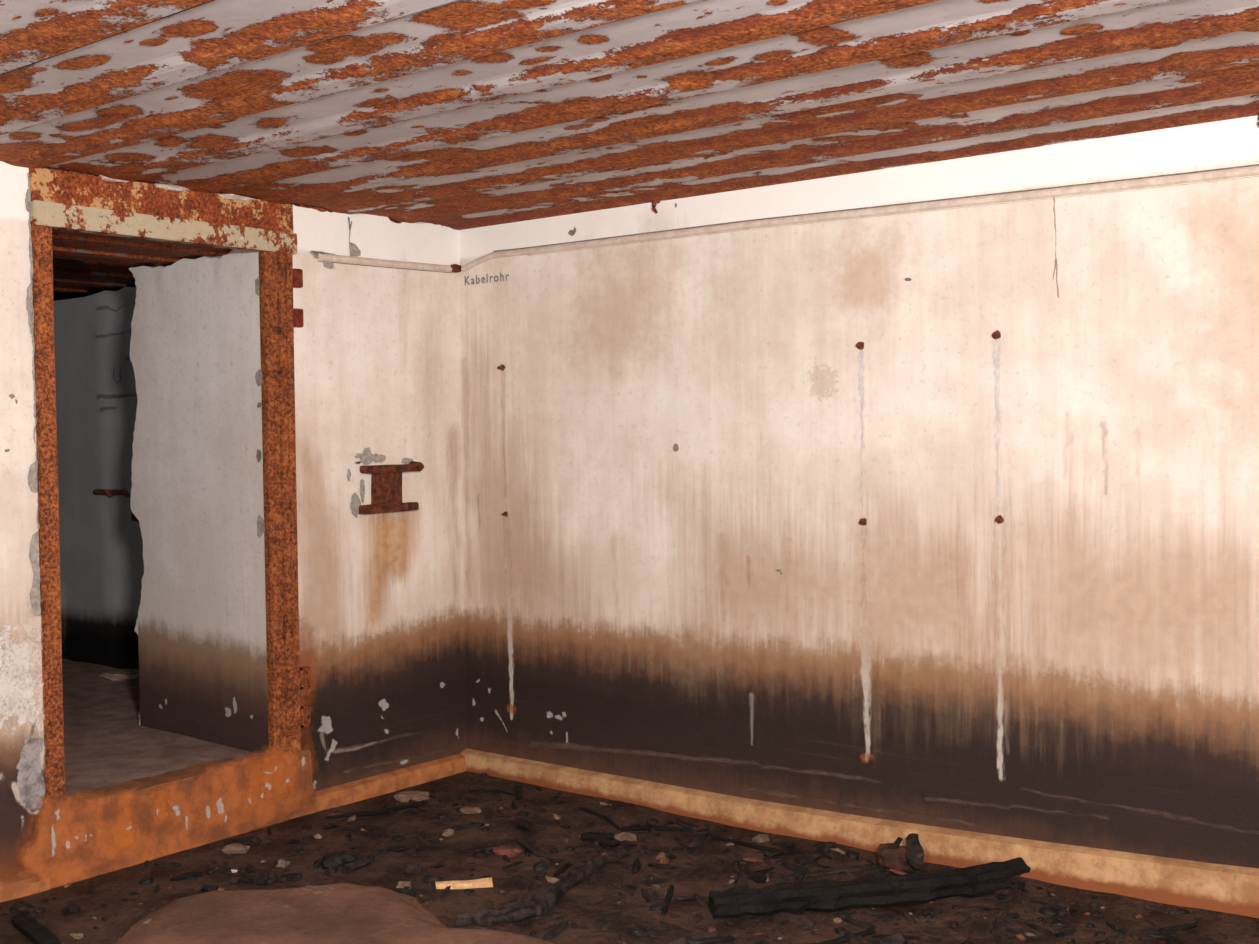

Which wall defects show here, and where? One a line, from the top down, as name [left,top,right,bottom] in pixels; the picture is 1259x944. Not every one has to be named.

corrosion [0,0,1259,230]
peeling [219,194,257,202]
leakage [61,613,269,753]
leakage [299,515,1259,868]
leakage [0,738,45,876]
peeling [12,716,46,813]
corrosion [21,747,316,889]